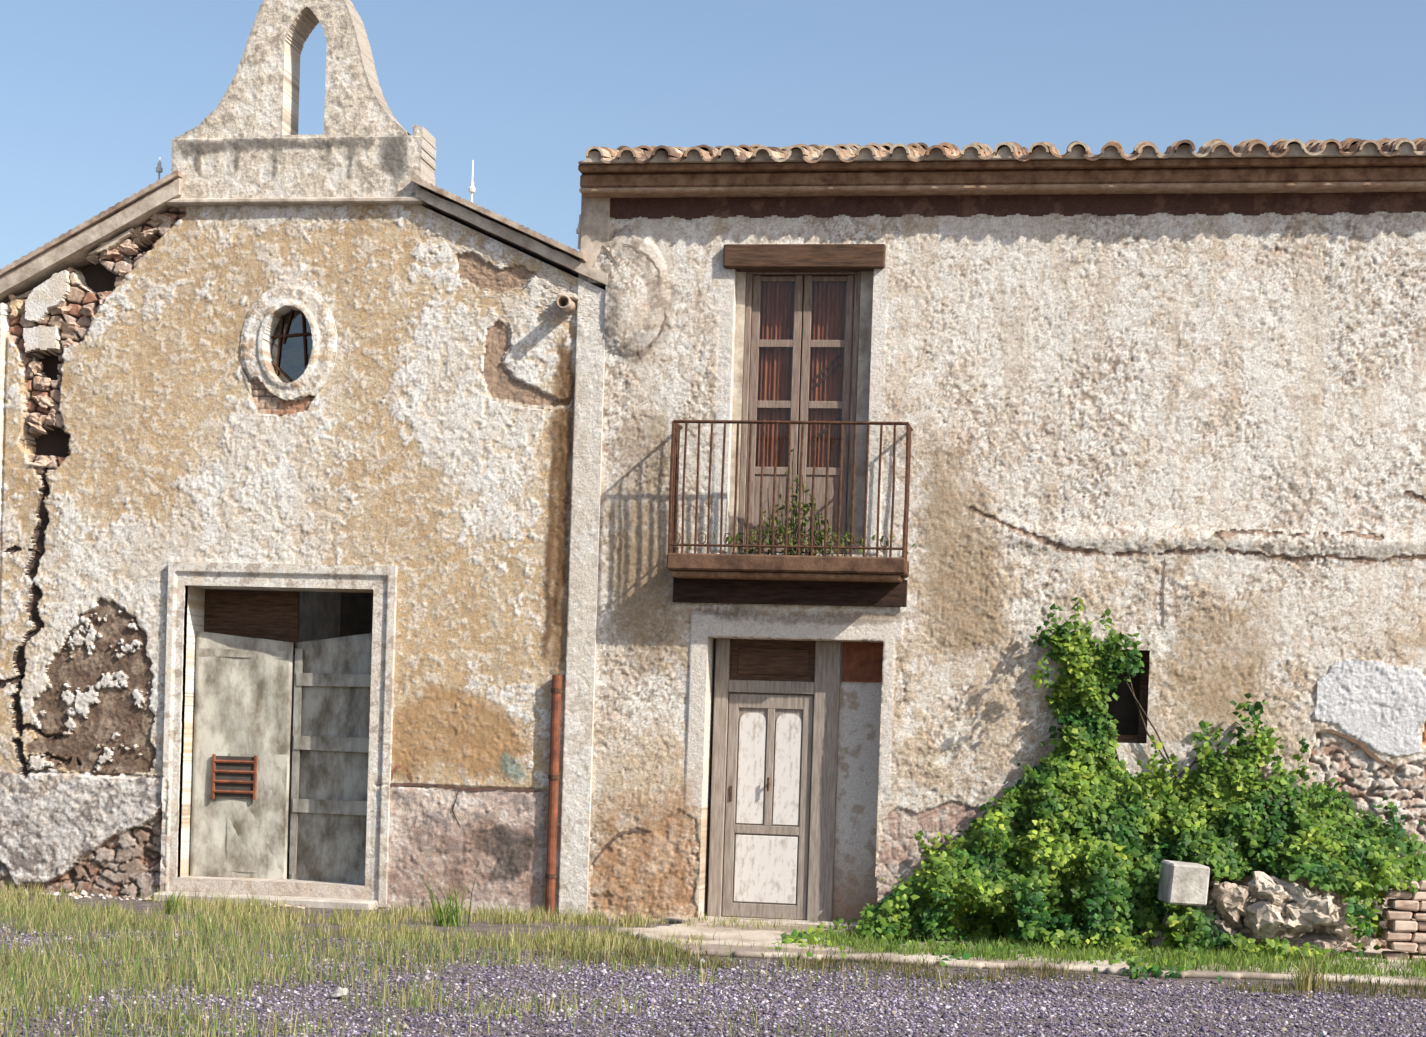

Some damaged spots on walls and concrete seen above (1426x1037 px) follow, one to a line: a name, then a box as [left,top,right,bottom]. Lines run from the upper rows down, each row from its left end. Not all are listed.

flaking render [456,252,537,296]
flaking render [481,320,573,410]
crack [0,207,186,779]
water stain [543,339,574,675]
crack [968,506,1426,627]
crack [1404,491,1426,504]
flaking render [25,598,156,777]
spalling [0,807,163,898]
spalling [1308,723,1426,867]
spalling [1362,884,1404,949]